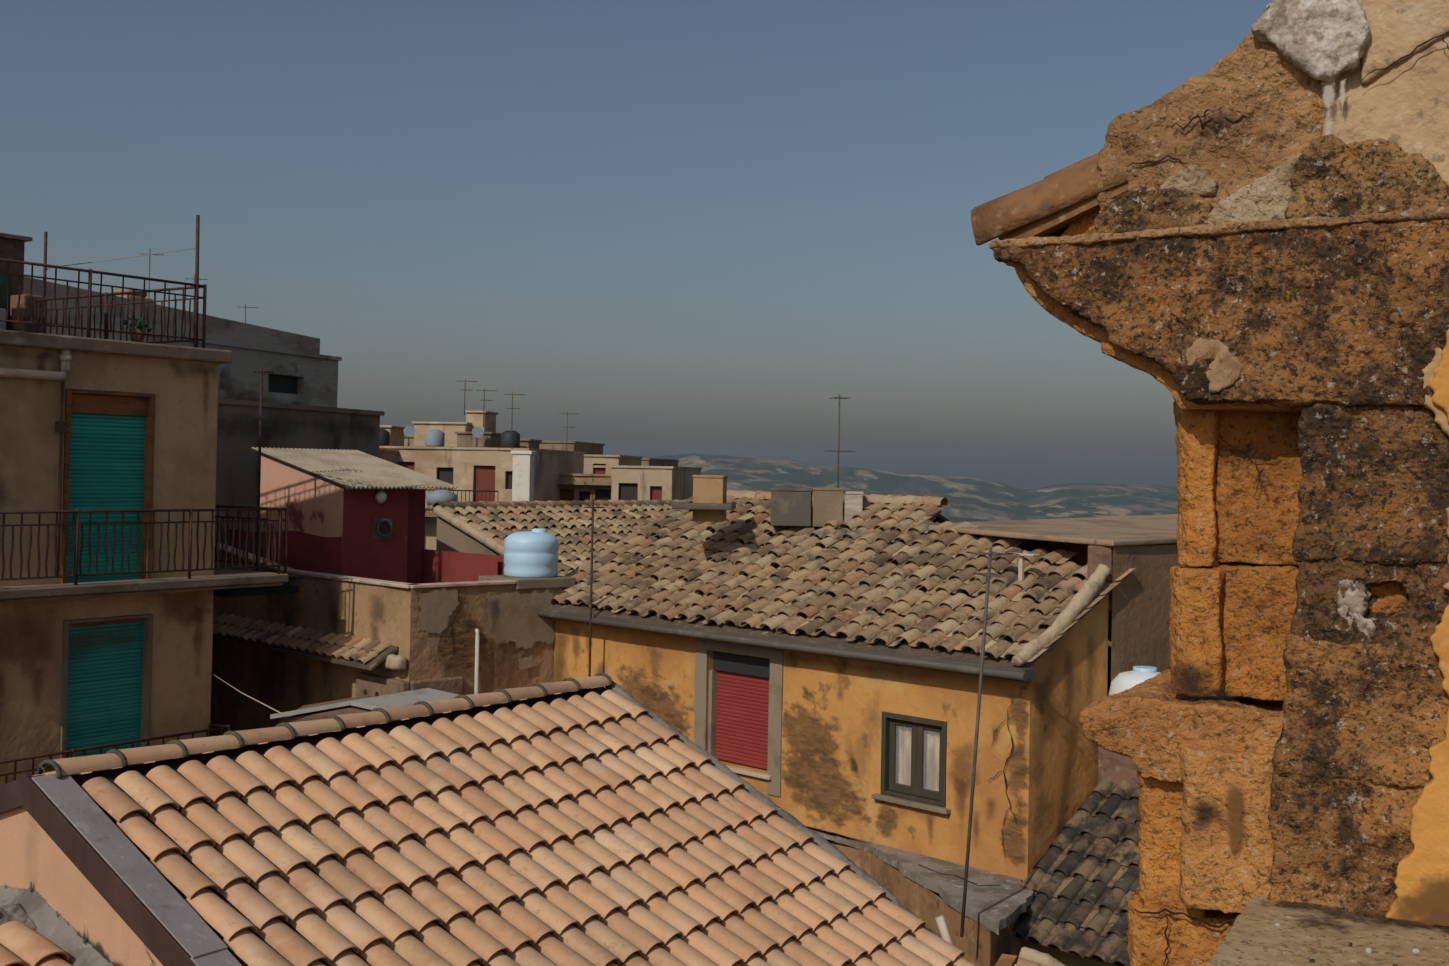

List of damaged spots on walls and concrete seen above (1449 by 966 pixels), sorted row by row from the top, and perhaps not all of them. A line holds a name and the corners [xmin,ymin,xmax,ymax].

crack [1360,31,1449,81]
crack [1127,109,1250,167]
spalling [1337,579,1407,637]